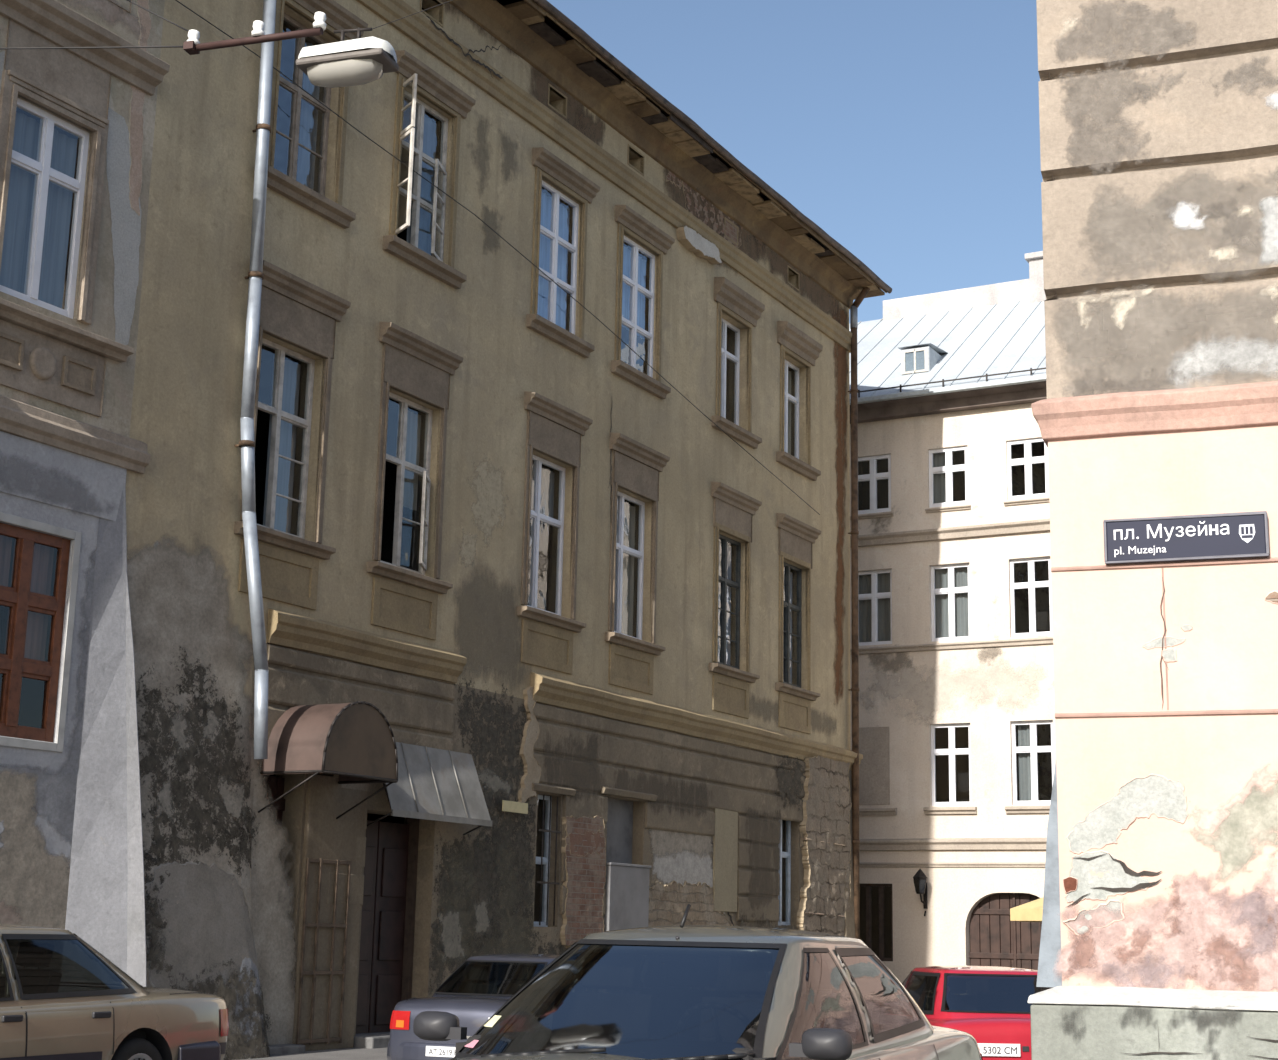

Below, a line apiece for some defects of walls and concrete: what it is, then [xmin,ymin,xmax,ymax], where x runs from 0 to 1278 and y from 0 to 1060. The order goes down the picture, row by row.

leakage [1079,289,1152,329]
leakage [1173,202,1204,228]
leakage [1210,248,1235,260]
leakage [1171,341,1278,383]
leakage [1240,197,1278,262]
crack [1160,578,1168,707]
peeling [1265,590,1278,604]
peeling [0,771,70,929]
leakage [136,646,273,1060]
leakage [428,678,568,994]
flaking render [560,815,606,948]
flaking render [1056,773,1278,992]